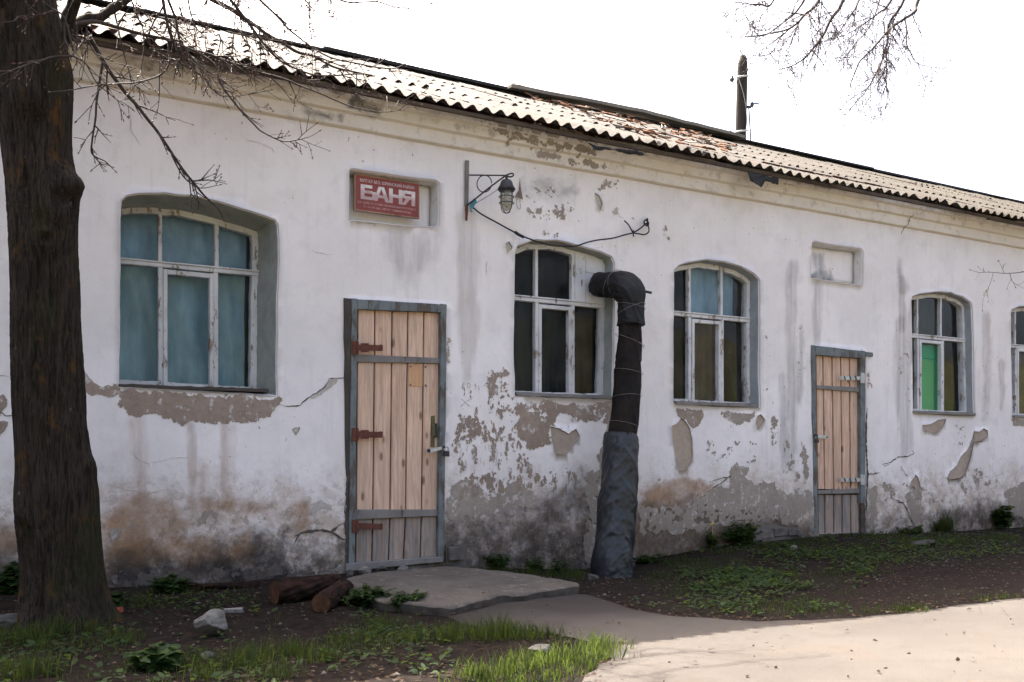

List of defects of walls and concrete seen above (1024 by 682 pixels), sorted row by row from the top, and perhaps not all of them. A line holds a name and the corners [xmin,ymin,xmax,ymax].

peeling [481,120,619,215]
peeling [526,187,574,238]
flaking render [0,394,8,435]
flaking render [85,373,283,429]
crack [280,378,341,407]
crack [293,466,349,562]
flaking render [446,367,612,567]
flaking render [637,408,814,543]
crack [865,408,920,525]
flaking render [865,470,943,528]
flaking render [922,419,1024,520]